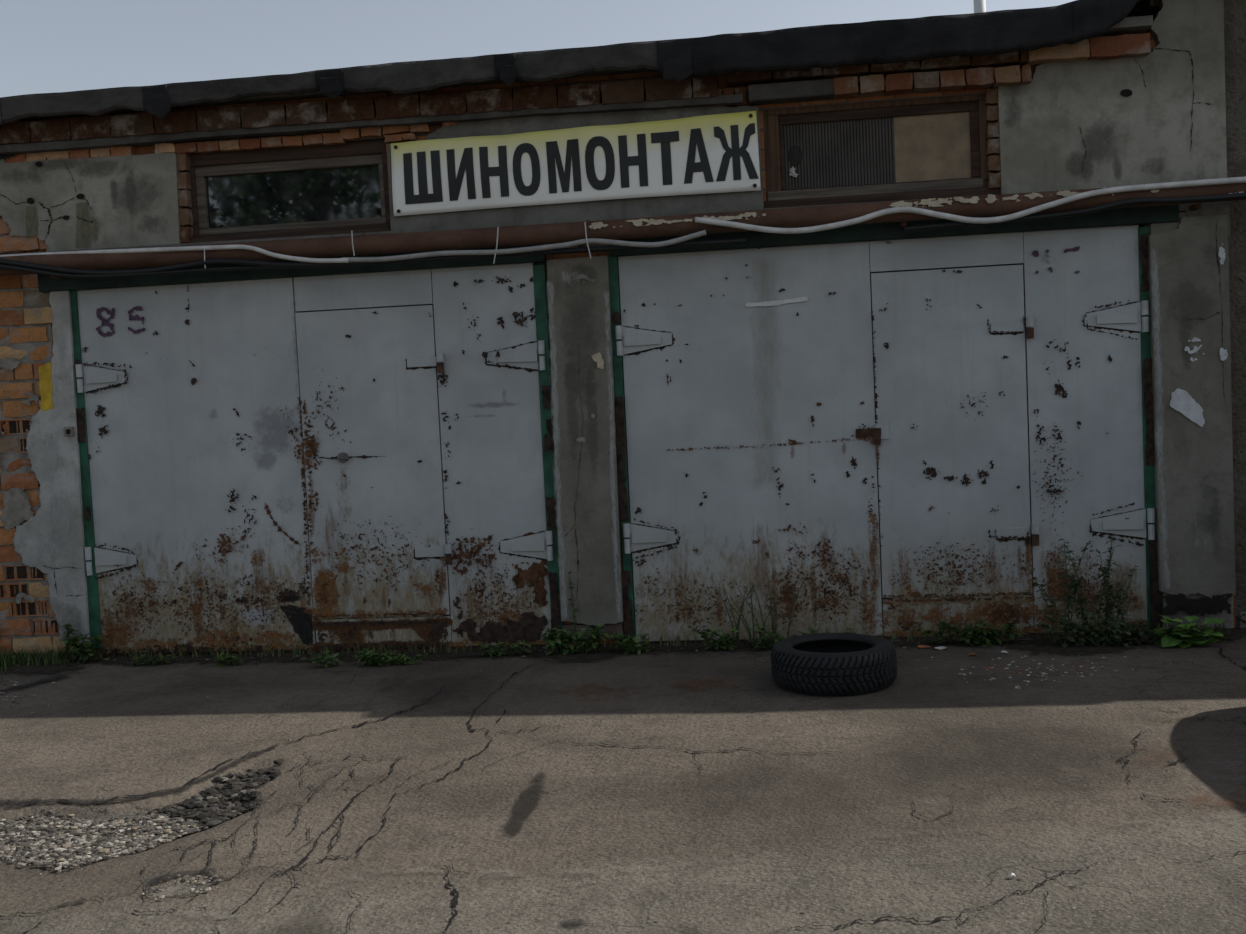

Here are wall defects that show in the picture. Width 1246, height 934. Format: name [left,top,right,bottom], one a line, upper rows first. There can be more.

crack [1133,48,1213,151]
crack [0,161,93,238]
flaking render [0,274,72,655]
rust [541,385,553,451]
rust [546,497,556,530]
rust [615,396,629,521]
rust [1143,357,1155,466]
peeling [1170,388,1205,427]
rust [97,548,561,655]
rust [622,571,633,637]
rust [860,512,1163,637]
spalling [6,745,278,811]